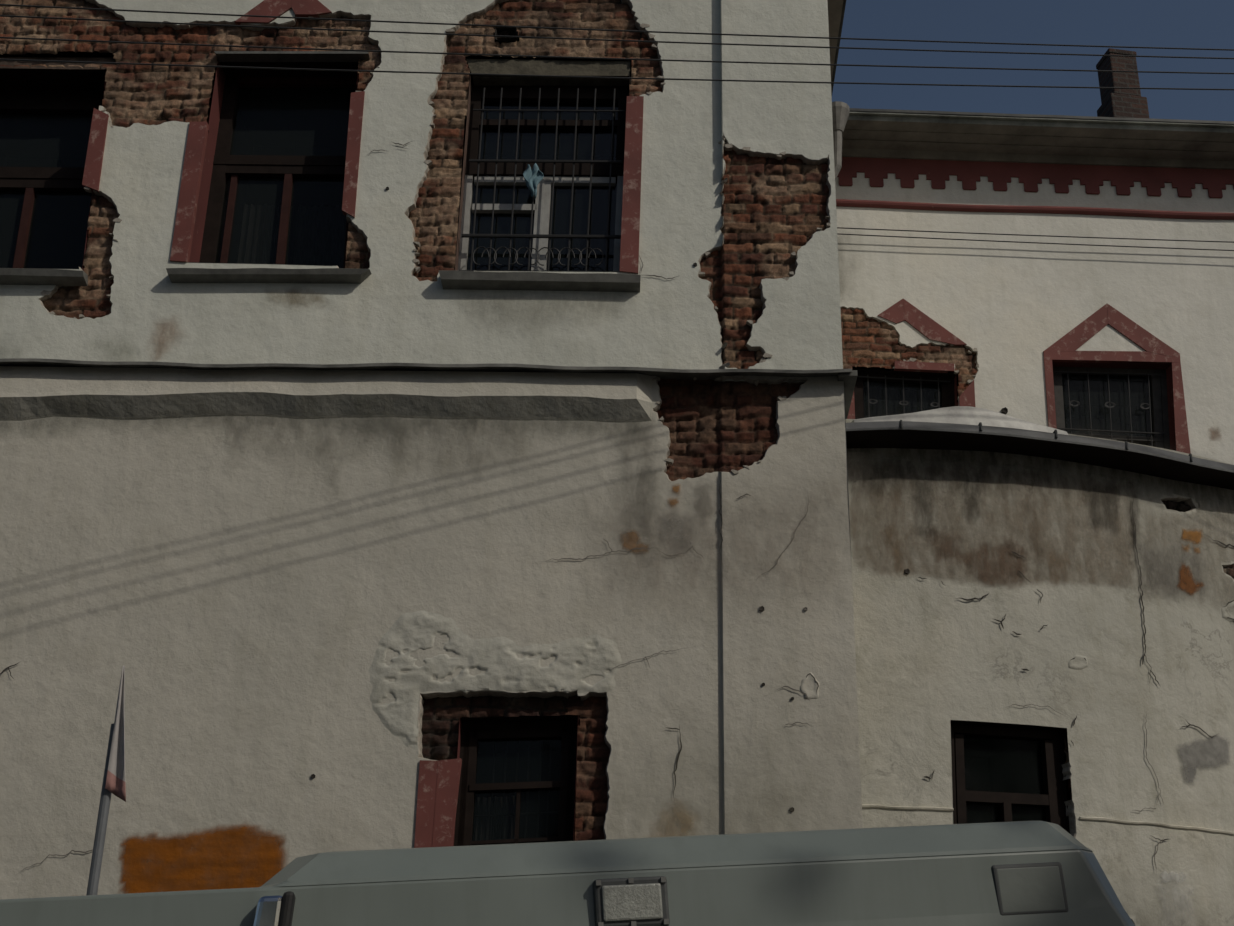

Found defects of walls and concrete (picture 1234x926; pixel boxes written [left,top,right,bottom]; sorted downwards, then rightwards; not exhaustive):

spalling [0,0,382,131]
spalling [404,0,666,282]
spalling [39,186,122,319]
spalling [337,216,371,269]
spalling [652,132,831,506]
spalling [840,306,979,400]
peeling [1178,565,1203,594]
crack [1130,482,1168,875]
spalling [417,690,612,841]